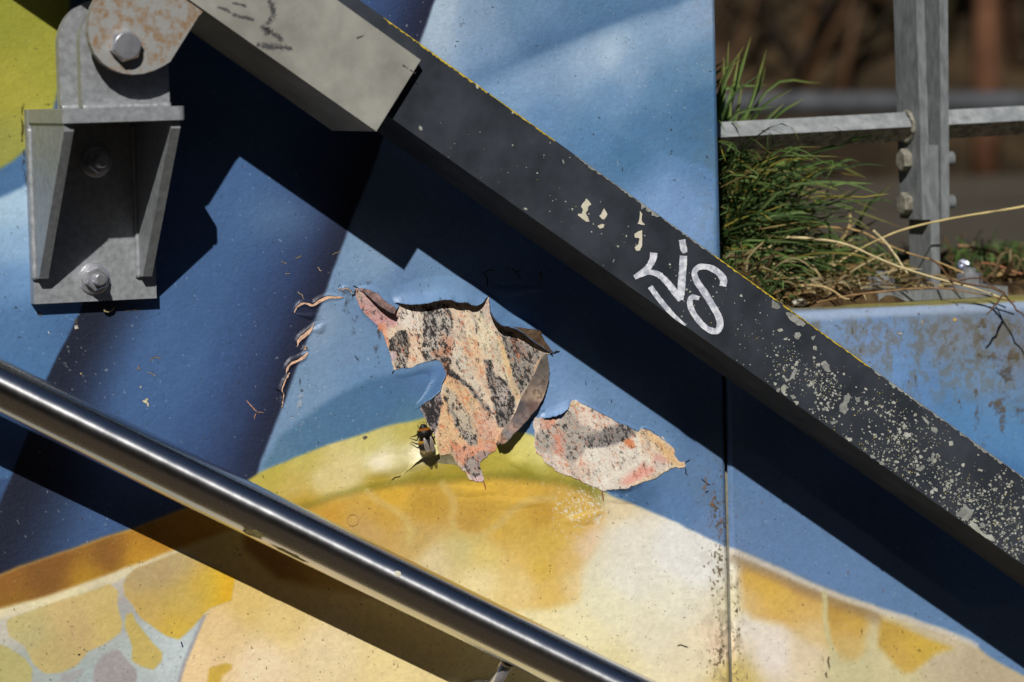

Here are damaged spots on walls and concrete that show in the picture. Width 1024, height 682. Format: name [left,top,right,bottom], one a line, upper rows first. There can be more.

spalling [562,155,713,255]
peeling [353,276,685,494]
spalling [752,300,1024,560]